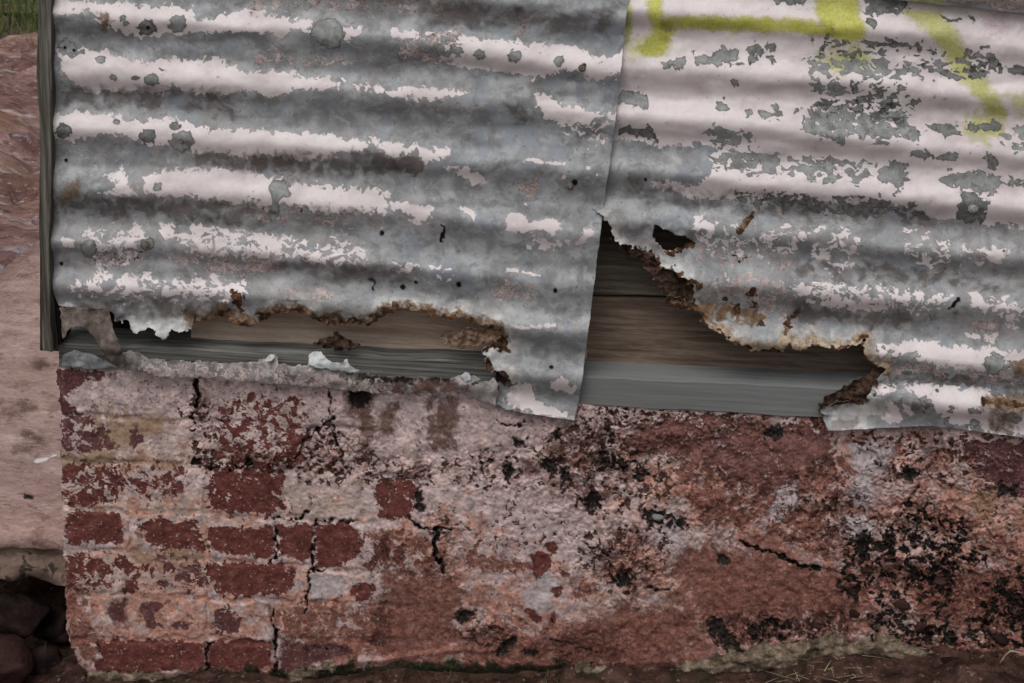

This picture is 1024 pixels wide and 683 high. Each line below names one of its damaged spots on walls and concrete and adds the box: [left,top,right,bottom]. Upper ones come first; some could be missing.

peeling [53,0,1024,327]
rust [184,289,518,387]
rust [609,236,780,352]
rust [805,334,880,413]
crack [270,497,356,613]
crack [408,516,461,574]
peeling [33,291,1024,674]
leakage [598,428,650,482]
leakage [639,505,690,557]
crack [739,540,821,571]
leakage [821,387,1024,650]
leakage [702,615,792,653]